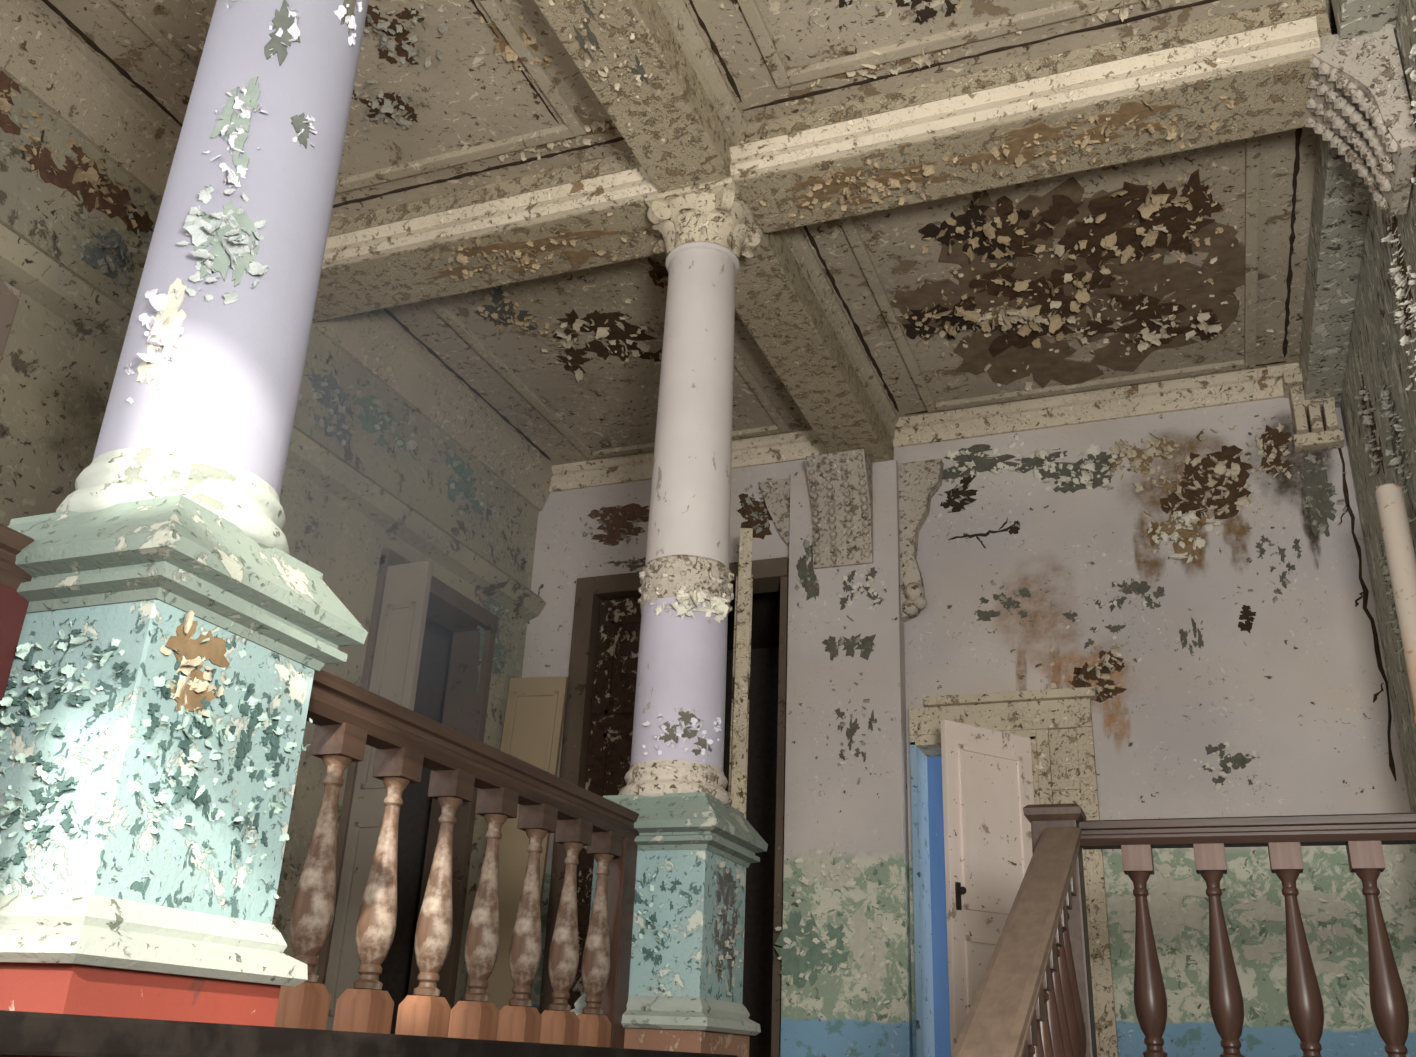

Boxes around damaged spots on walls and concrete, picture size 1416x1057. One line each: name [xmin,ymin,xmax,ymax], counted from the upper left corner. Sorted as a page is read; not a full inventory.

peeling [264,0,301,66]
peeling [334,0,458,141]
peeling [0,71,269,404]
peeling [422,212,662,413]
peeling [759,95,1271,397]
crack [1256,128,1302,366]
peeling [1353,214,1416,503]
peeling [0,622,133,896]
peeling [127,610,313,863]
crack [948,517,1017,548]
peeling [939,418,1347,703]
crack [1338,448,1397,781]